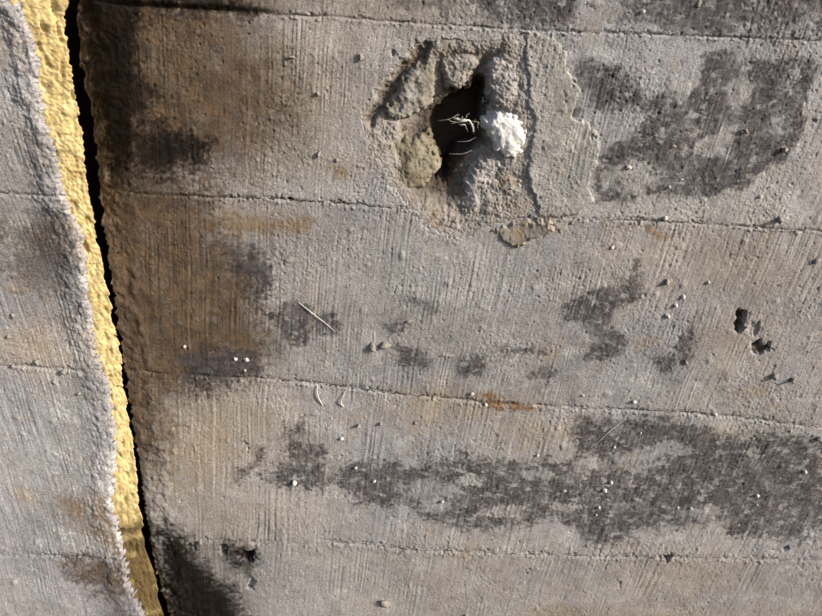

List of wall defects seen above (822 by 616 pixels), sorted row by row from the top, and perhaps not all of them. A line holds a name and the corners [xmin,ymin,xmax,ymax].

damp [471,0,577,28]
damp [624,0,792,35]
spalling [362,29,600,248]
damp [573,49,820,201]
damp [78,0,340,467]
damp [394,344,431,367]
damp [457,355,486,377]
damp [230,414,822,549]
damp [152,521,245,616]
damp [224,544,263,577]